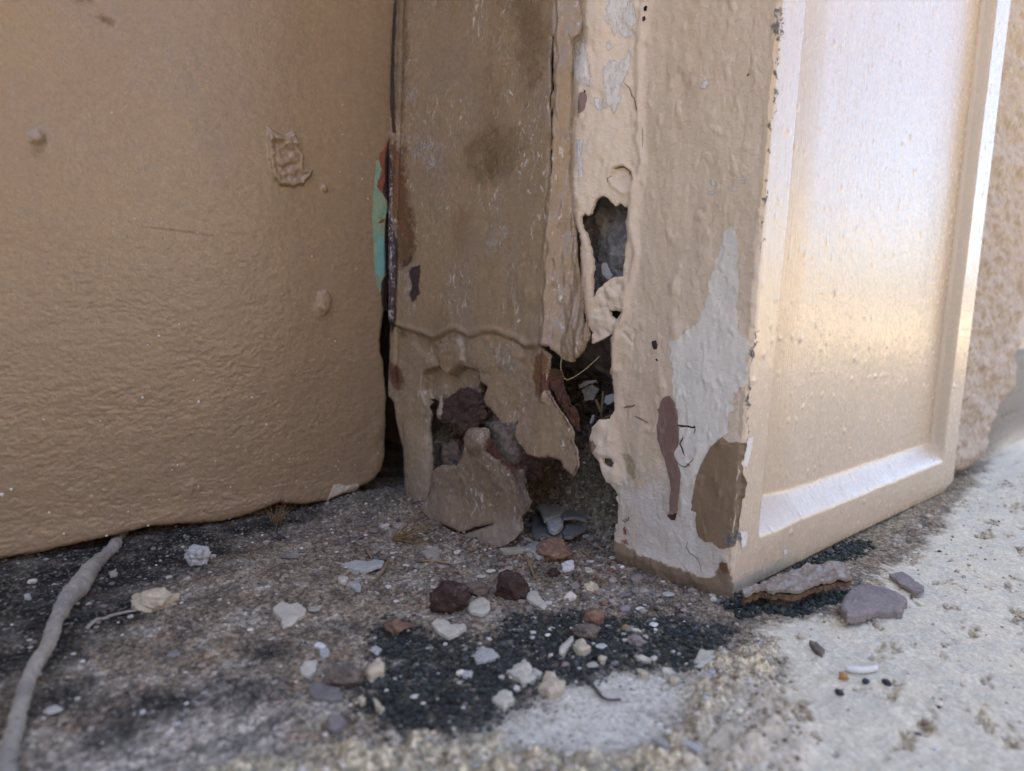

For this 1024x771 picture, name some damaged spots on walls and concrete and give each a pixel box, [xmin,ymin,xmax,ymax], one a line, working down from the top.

peeling [572,0,647,113]
hole [577,197,628,296]
peeling [582,381,614,405]
peeling [614,226,749,579]
peeling [741,436,754,467]